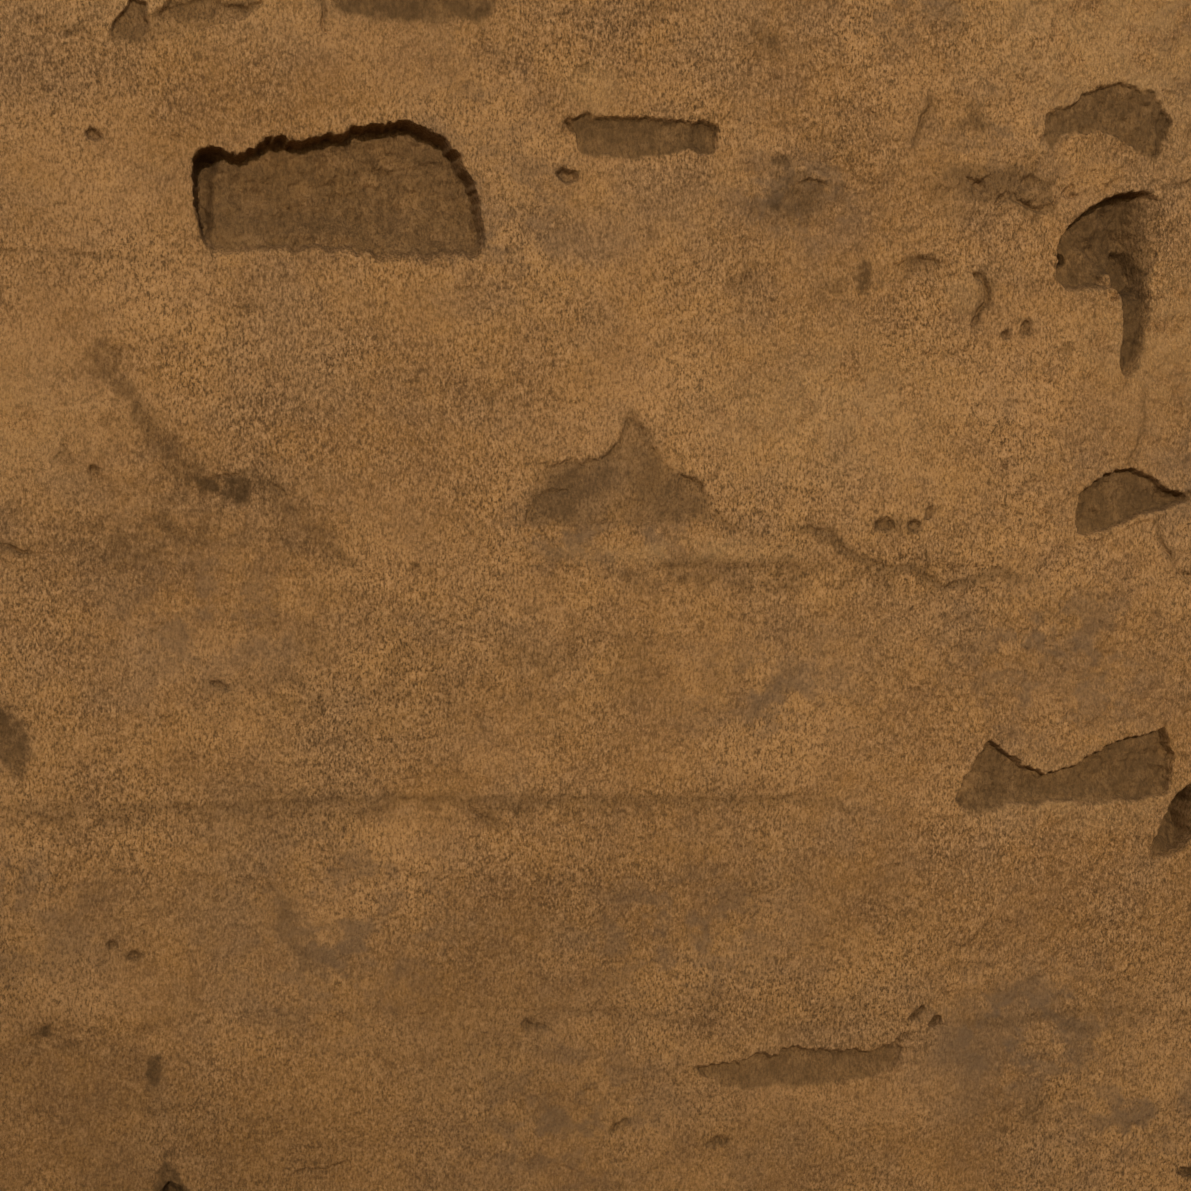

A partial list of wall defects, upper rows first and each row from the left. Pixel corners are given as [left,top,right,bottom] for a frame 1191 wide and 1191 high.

spalling [33,0,272,53]
spalling [317,0,499,44]
spalling [555,109,725,186]
spalling [191,119,492,272]
spalling [935,79,1174,297]
spalling [521,408,746,542]
spalling [1073,466,1170,539]
crack [642,520,1057,595]
spalling [951,724,1191,873]
spalling [698,1042,907,1101]